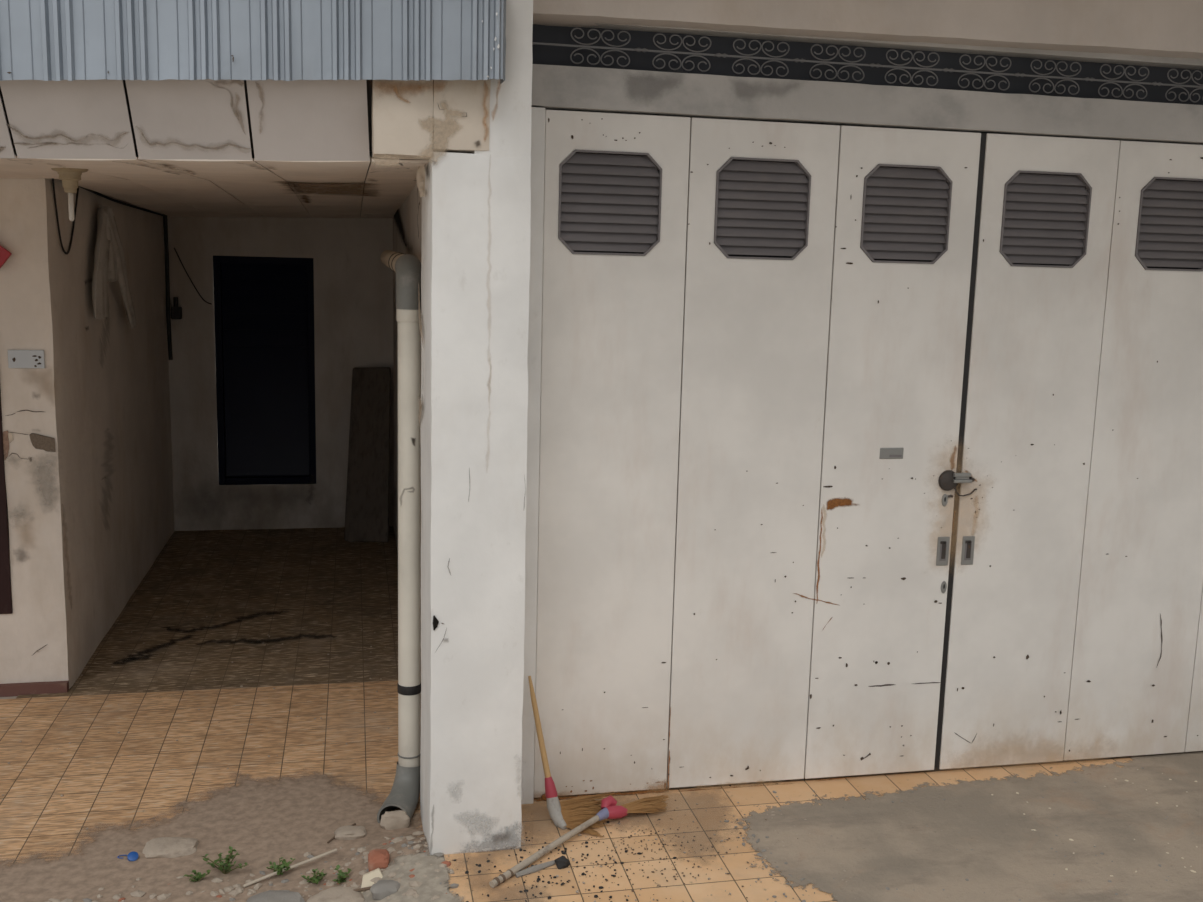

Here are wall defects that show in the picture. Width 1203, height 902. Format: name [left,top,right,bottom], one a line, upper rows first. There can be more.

damp [0,125,75,148]
damp [286,172,373,203]
flaking render [29,433,56,452]
corrosion [793,511,838,629]